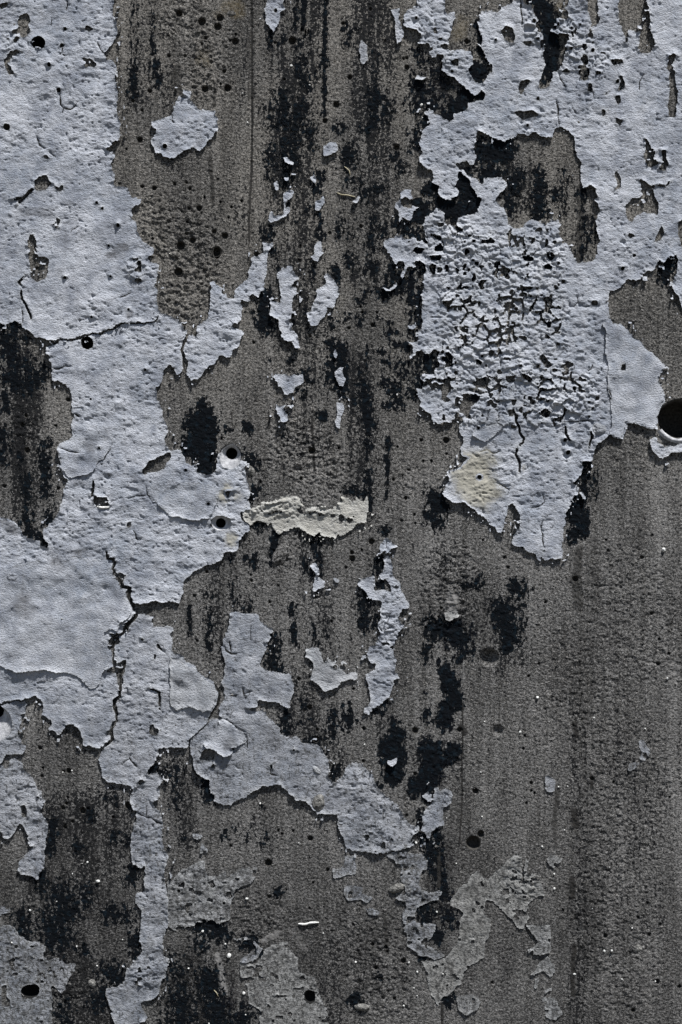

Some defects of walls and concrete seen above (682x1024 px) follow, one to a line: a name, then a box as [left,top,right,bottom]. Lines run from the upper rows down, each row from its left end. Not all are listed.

peeling [383,0,682,564]
crack [48,313,160,370]
peeling [0,0,544,1024]
crack [106,551,137,767]
peeling [628,728,650,771]
peeling [545,775,568,792]
peeling [541,846,562,875]
peeling [527,925,555,977]
peeling [541,988,562,1020]